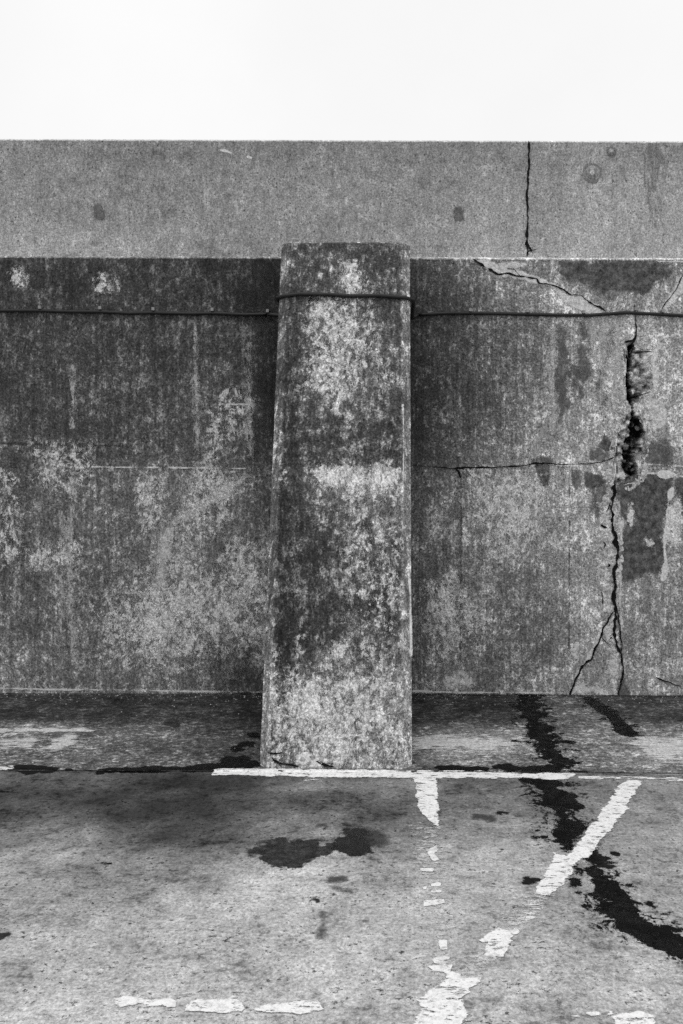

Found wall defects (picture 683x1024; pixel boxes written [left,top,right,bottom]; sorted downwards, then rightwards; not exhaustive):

crack [473,141,606,313]
crack [411,435,683,697]
water stain [461,312,683,581]
spalling [594,339,677,612]
water stain [627,730,683,766]